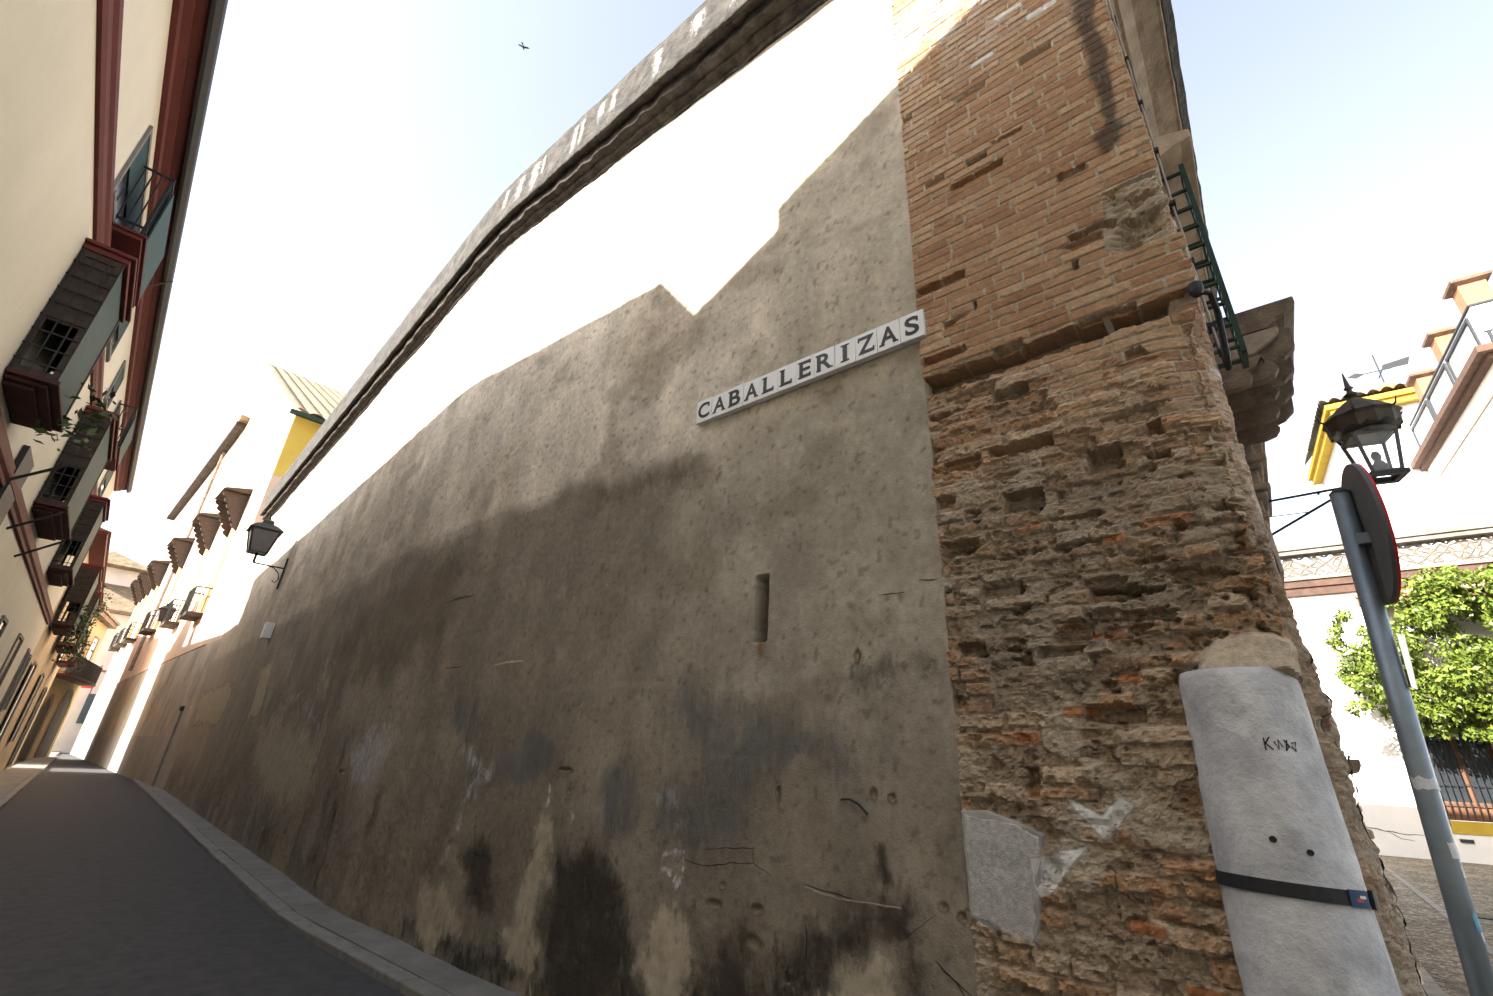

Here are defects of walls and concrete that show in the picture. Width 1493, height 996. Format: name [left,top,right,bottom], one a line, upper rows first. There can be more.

spalling [1103,174,1169,251]
spalling [1102,511,1191,544]
water stain [391,769,642,996]
water stain [684,898,919,996]